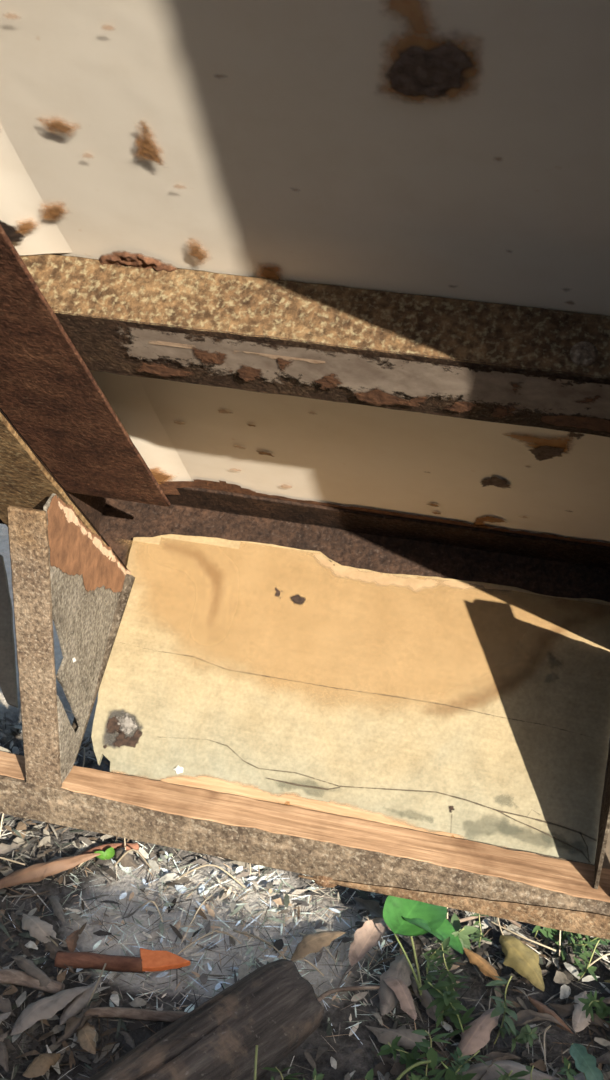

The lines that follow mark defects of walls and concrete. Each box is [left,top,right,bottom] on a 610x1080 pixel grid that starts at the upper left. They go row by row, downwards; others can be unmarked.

corrosion [382,0,479,102]